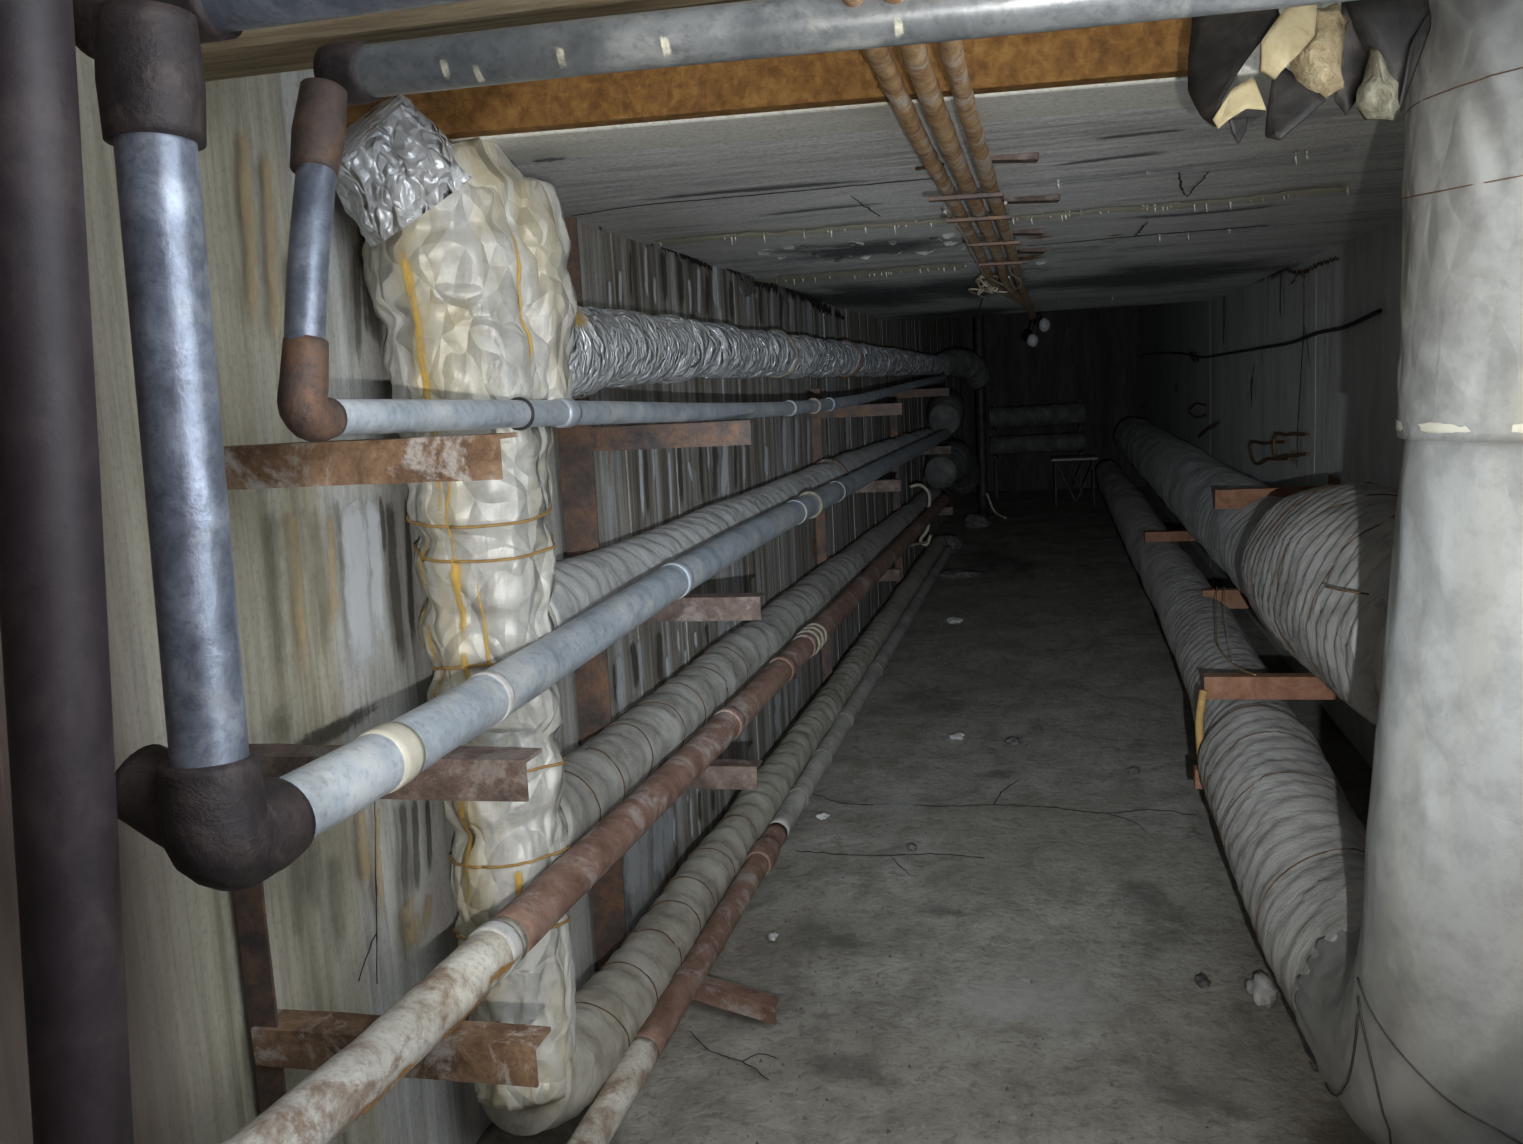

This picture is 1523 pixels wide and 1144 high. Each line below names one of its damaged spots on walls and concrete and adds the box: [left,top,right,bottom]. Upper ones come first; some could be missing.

water stain [1103,130,1181,139]
water stain [663,181,856,199]
water stain [609,185,1349,343]
crack [816,780,1192,831]